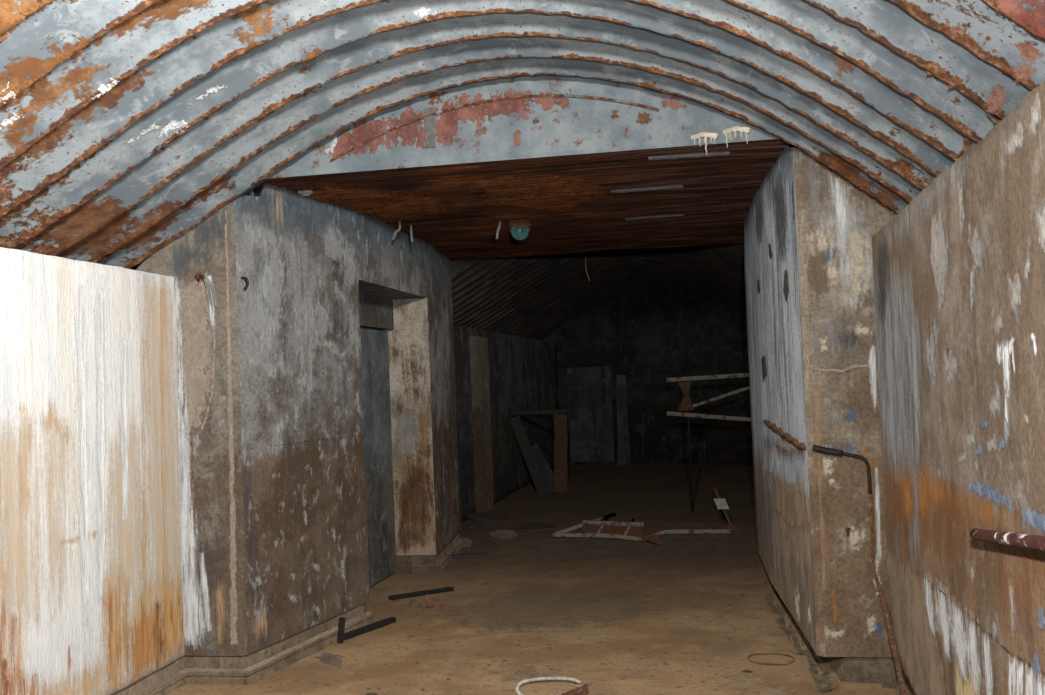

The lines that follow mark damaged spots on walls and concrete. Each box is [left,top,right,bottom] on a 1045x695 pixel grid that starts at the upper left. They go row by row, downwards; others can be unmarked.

corrosion [0,0,216,170]
corrosion [229,0,289,50]
corrosion [299,45,323,73]
corrosion [626,81,687,112]
corrosion [984,84,1008,114]
corrosion [985,0,1045,82]
corrosion [33,173,236,260]
corrosion [0,280,184,695]
corrosion [396,417,433,552]